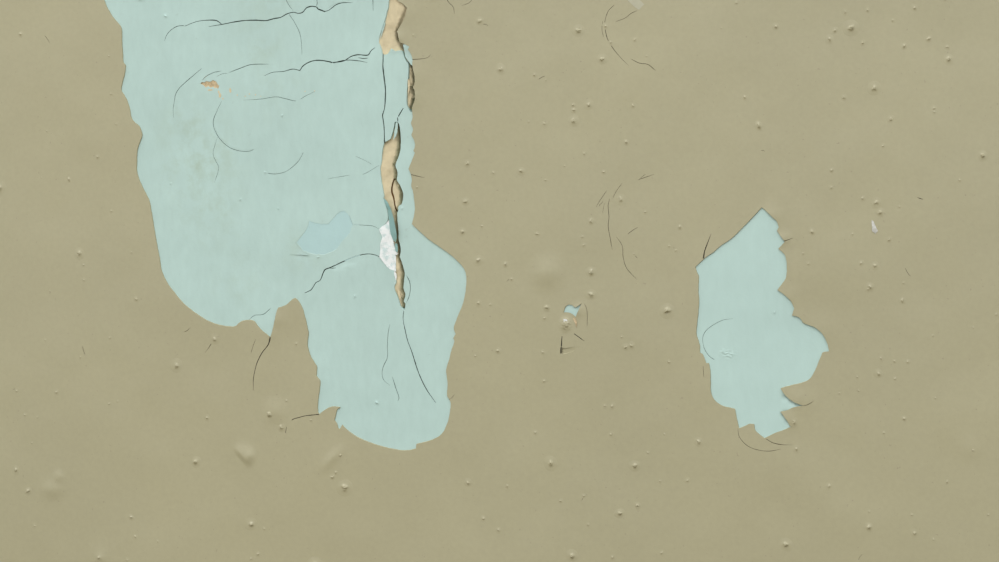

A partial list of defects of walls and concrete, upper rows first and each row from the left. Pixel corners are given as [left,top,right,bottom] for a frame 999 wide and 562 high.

crack [213,101,254,183]
crack [164,0,403,142]
peeling [104,0,466,451]
crack [305,254,379,293]
peeling [695,207,829,438]